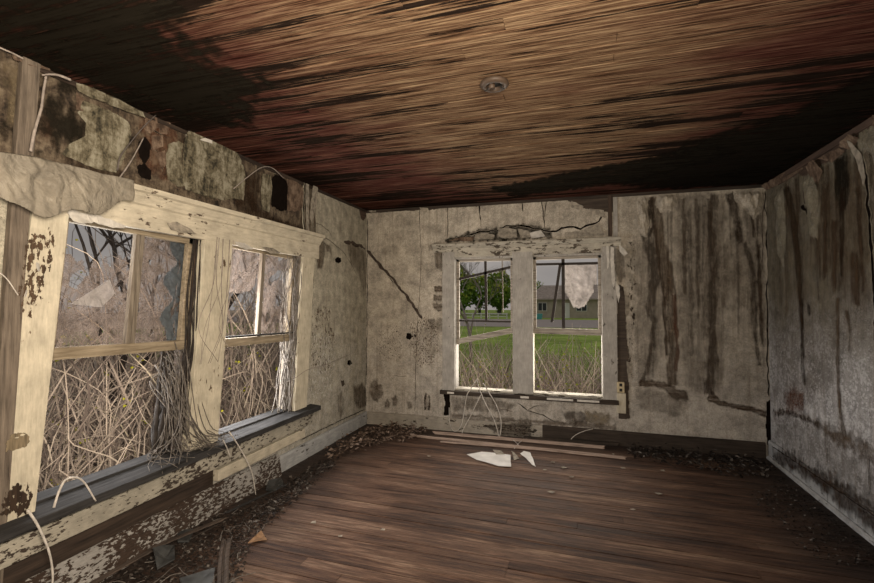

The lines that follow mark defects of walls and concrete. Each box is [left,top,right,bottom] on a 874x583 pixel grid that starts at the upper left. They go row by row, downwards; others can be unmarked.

flaking render [143,117,170,172]
flaking render [287,179,309,231]
peeling [18,228,54,318]
water stain [491,72,874,458]
crack [847,141,874,343]
crack [316,210,423,397]
peeling [5,433,30,452]
crack [302,398,367,439]
peeling [0,482,33,518]